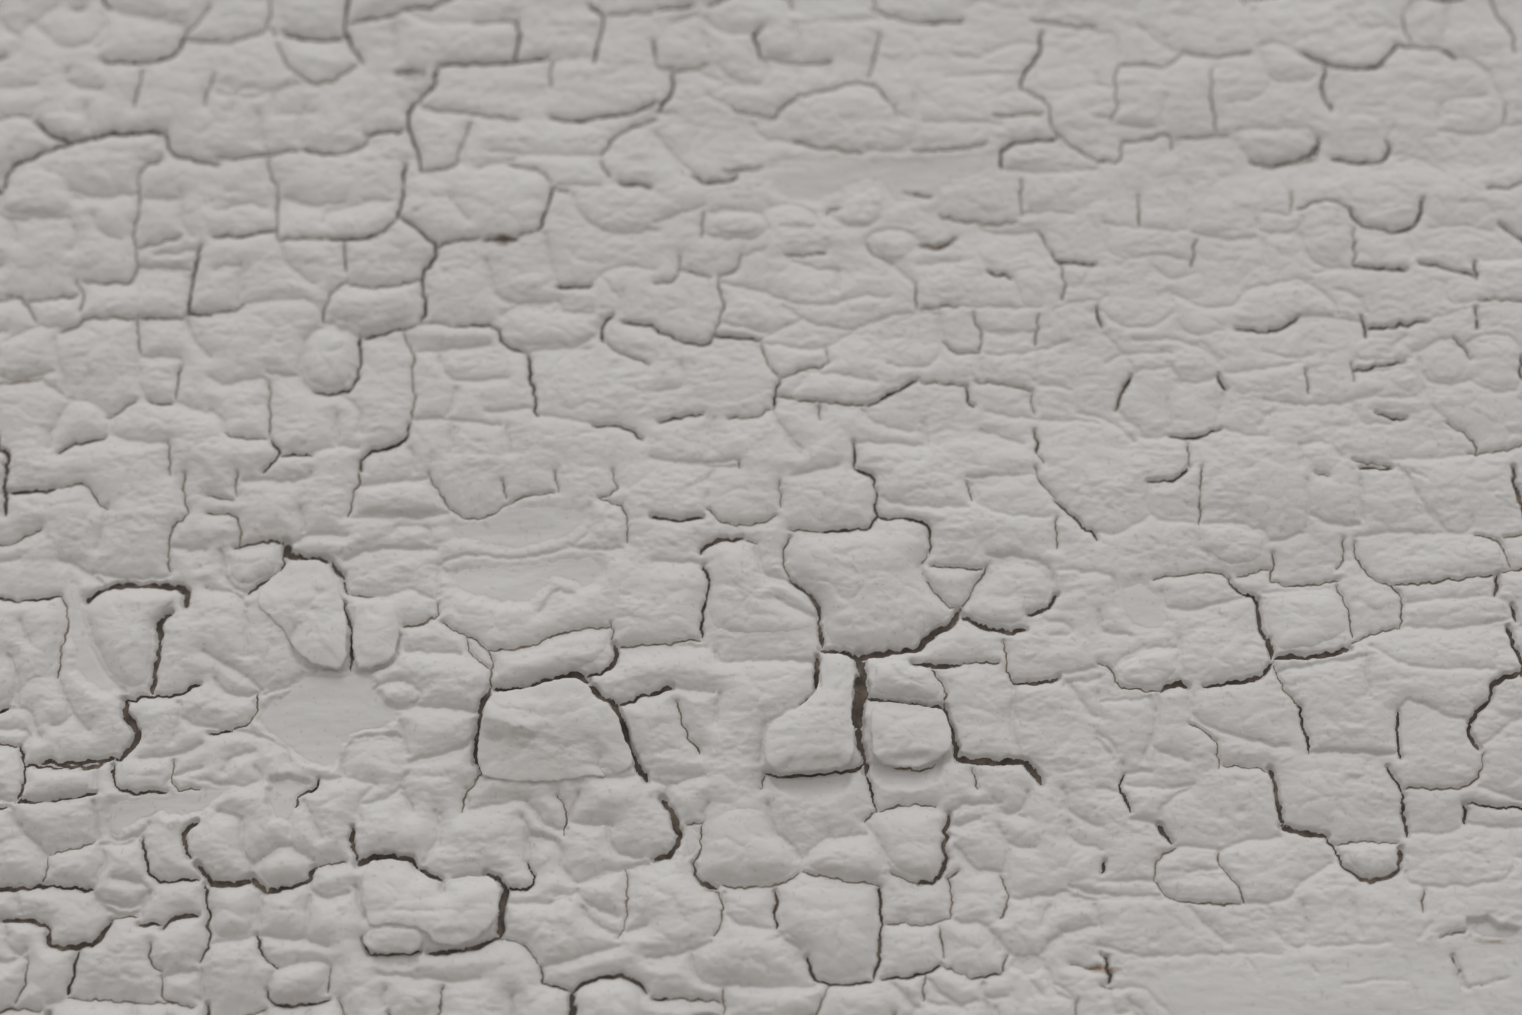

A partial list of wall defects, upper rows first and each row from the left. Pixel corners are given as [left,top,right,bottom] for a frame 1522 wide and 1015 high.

crack [0,0,725,517]
crack [558,0,1522,549]
crack [0,367,442,1015]
spalling [257,560,399,766]
crack [364,443,1058,1015]
crack [1071,954,1112,1015]
crack [1098,423,1522,988]